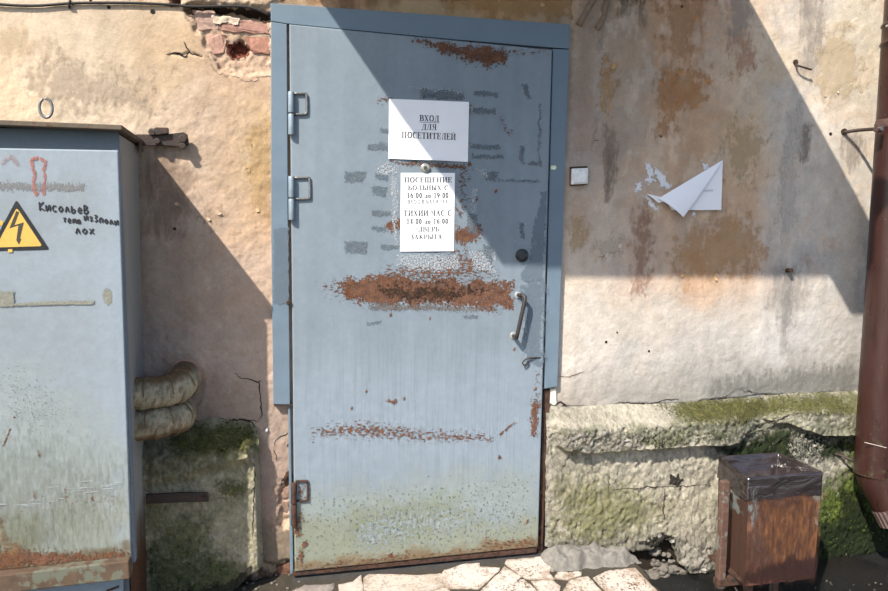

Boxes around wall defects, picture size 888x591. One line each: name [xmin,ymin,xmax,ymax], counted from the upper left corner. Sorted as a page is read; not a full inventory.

spalling [169,0,271,82]
rust [408,33,550,71]
rust [322,160,515,320]
crack [220,373,263,427]
rust [308,406,517,444]
rust [529,368,542,438]
crack [700,387,783,401]
crack [738,415,789,442]
crack [249,457,257,539]
spalling [639,532,715,574]